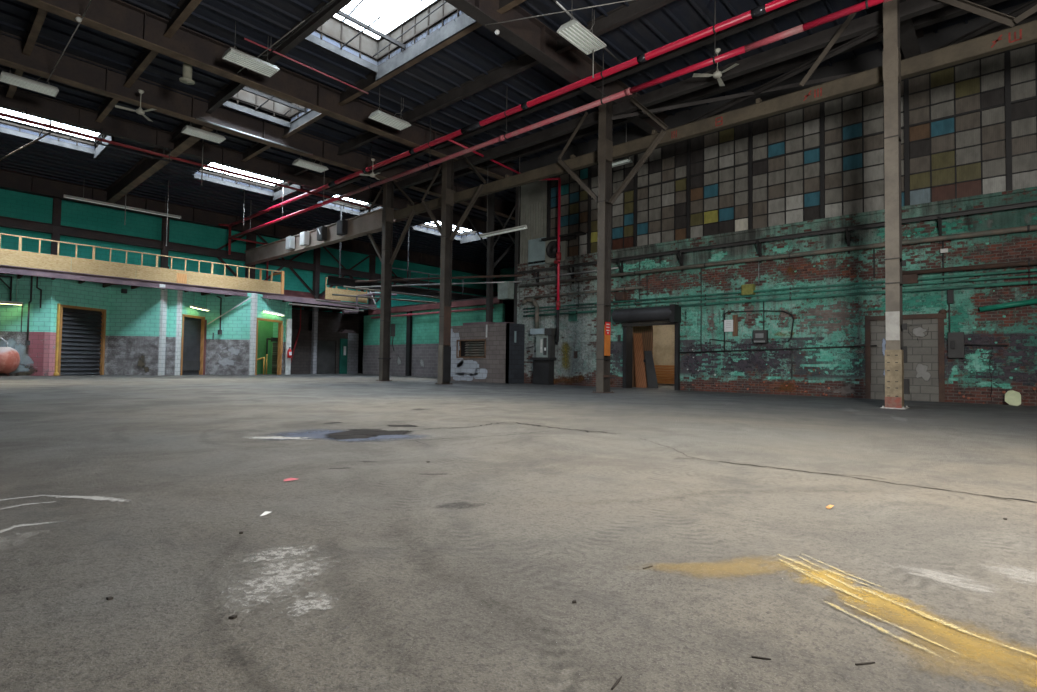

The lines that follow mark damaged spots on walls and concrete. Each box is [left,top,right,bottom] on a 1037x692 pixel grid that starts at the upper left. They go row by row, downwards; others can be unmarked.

peeling [611,258,677,272]
peeling [681,242,886,396]
leakage [325,429,411,440]